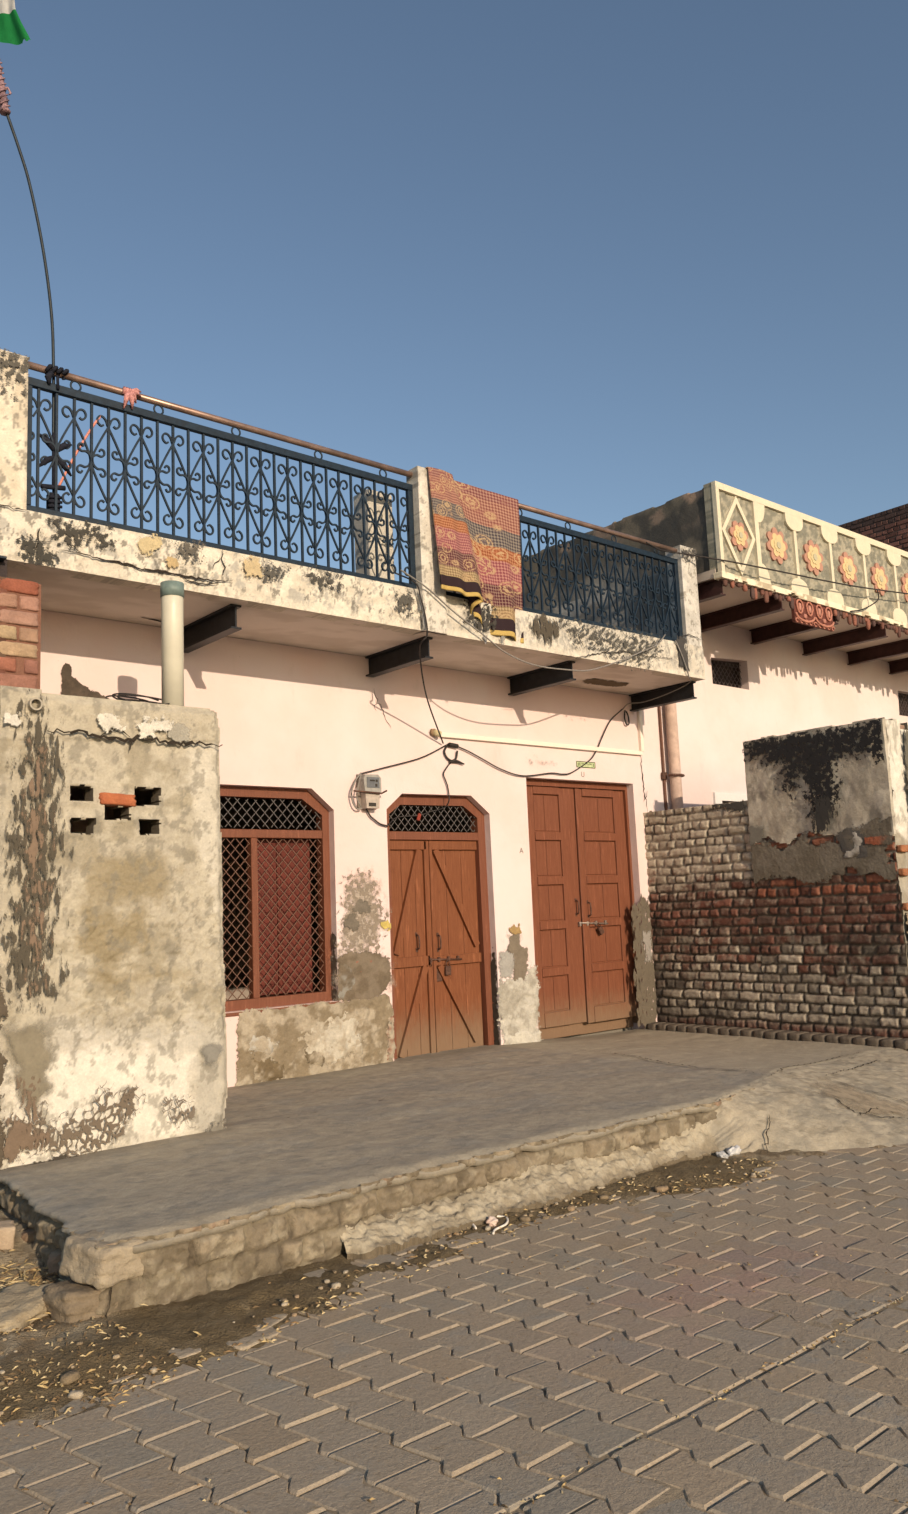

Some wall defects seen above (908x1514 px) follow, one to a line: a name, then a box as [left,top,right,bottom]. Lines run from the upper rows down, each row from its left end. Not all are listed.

water stain [16,517,116,567]
water stain [172,539,204,563]
water stain [260,557,344,592]
water stain [395,589,427,629]
crack [47,728,222,749]
water stain [742,719,885,840]
spalling [751,816,908,884]
spalling [235,868,396,1086]
spalling [497,923,544,1045]